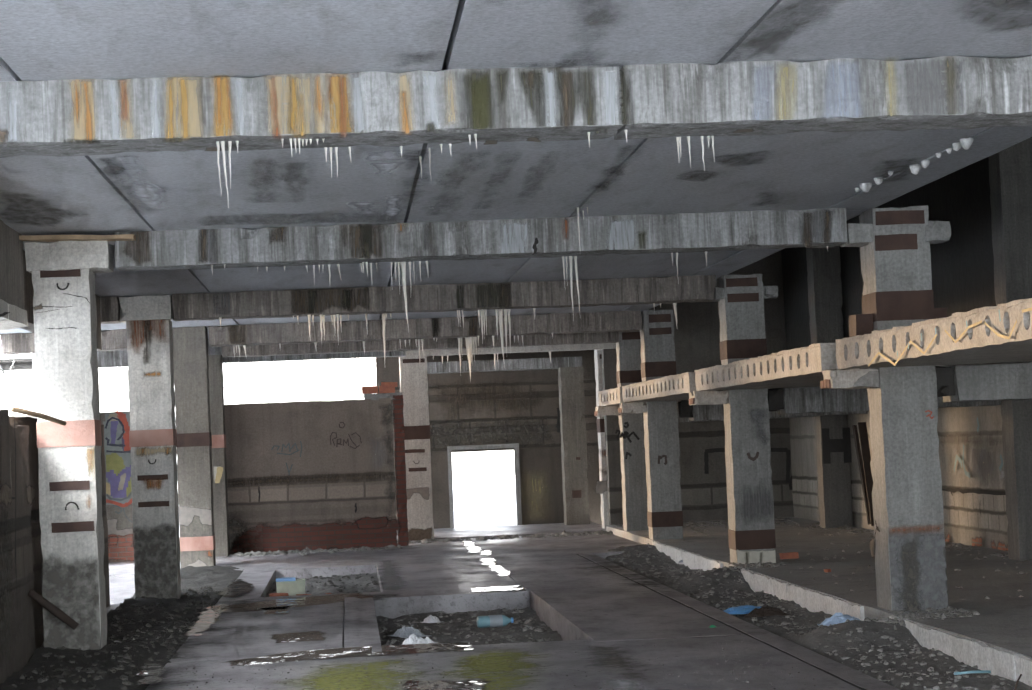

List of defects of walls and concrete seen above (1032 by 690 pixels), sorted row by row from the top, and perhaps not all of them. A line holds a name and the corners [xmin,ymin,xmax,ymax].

corrosion [71,79,95,141]
corrosion [120,83,133,139]
corrosion [166,77,201,139]
corrosion [215,76,231,136]
corrosion [268,75,352,137]
damp [463,70,508,129]
damp [521,60,634,129]
damp [291,287,369,314]
damp [457,284,511,336]